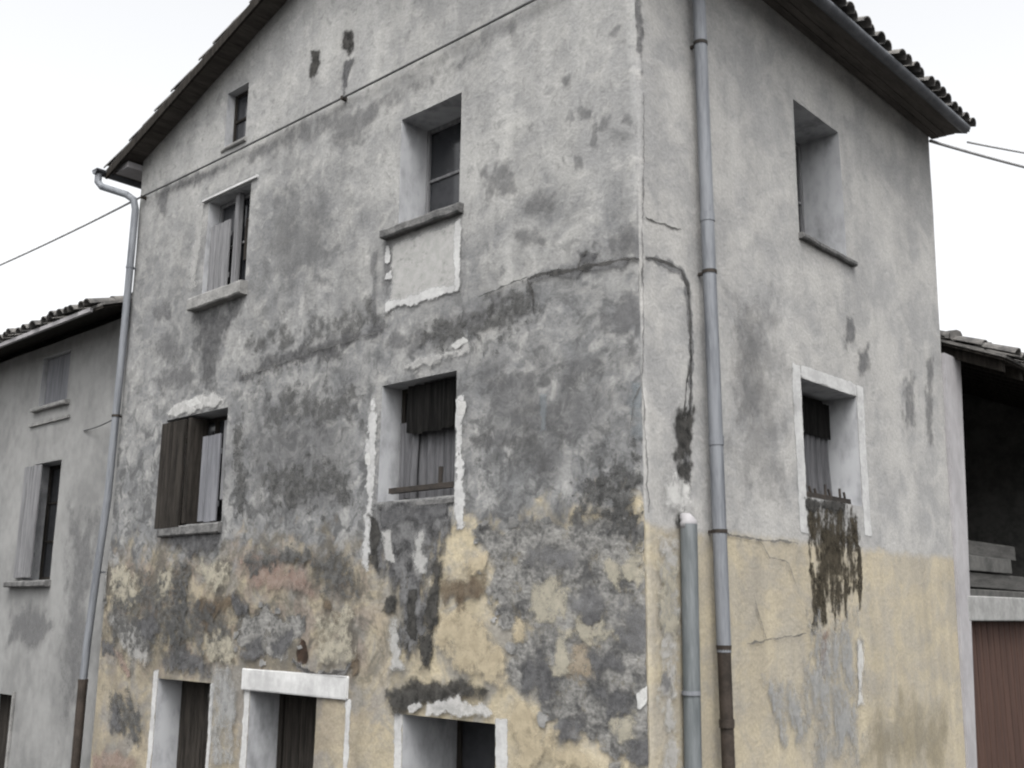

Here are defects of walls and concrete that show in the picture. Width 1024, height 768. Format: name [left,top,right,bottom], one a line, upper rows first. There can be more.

damp [309,50,320,78]
damp [342,29,354,96]
peeling [385,218,462,312]
crack [479,92,694,513]
damp [167,533,219,669]
damp [368,497,486,670]
flaking render [385,395,684,768]
crack [727,533,798,586]
crack [747,601,806,644]
mould [805,496,863,634]